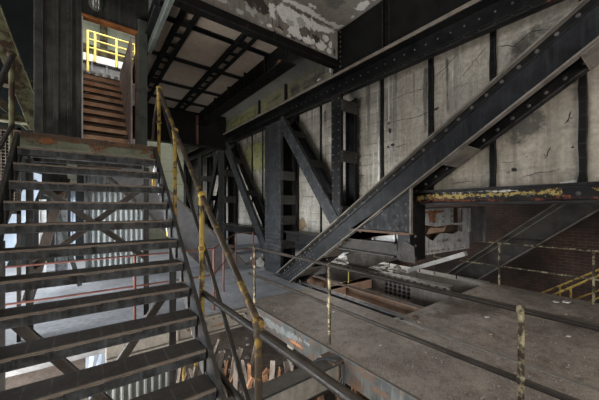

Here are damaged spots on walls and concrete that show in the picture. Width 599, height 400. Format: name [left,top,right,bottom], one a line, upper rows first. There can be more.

peeling [352,0,375,18]
peeling [236,1,335,56]
corrosion [417,188,584,223]